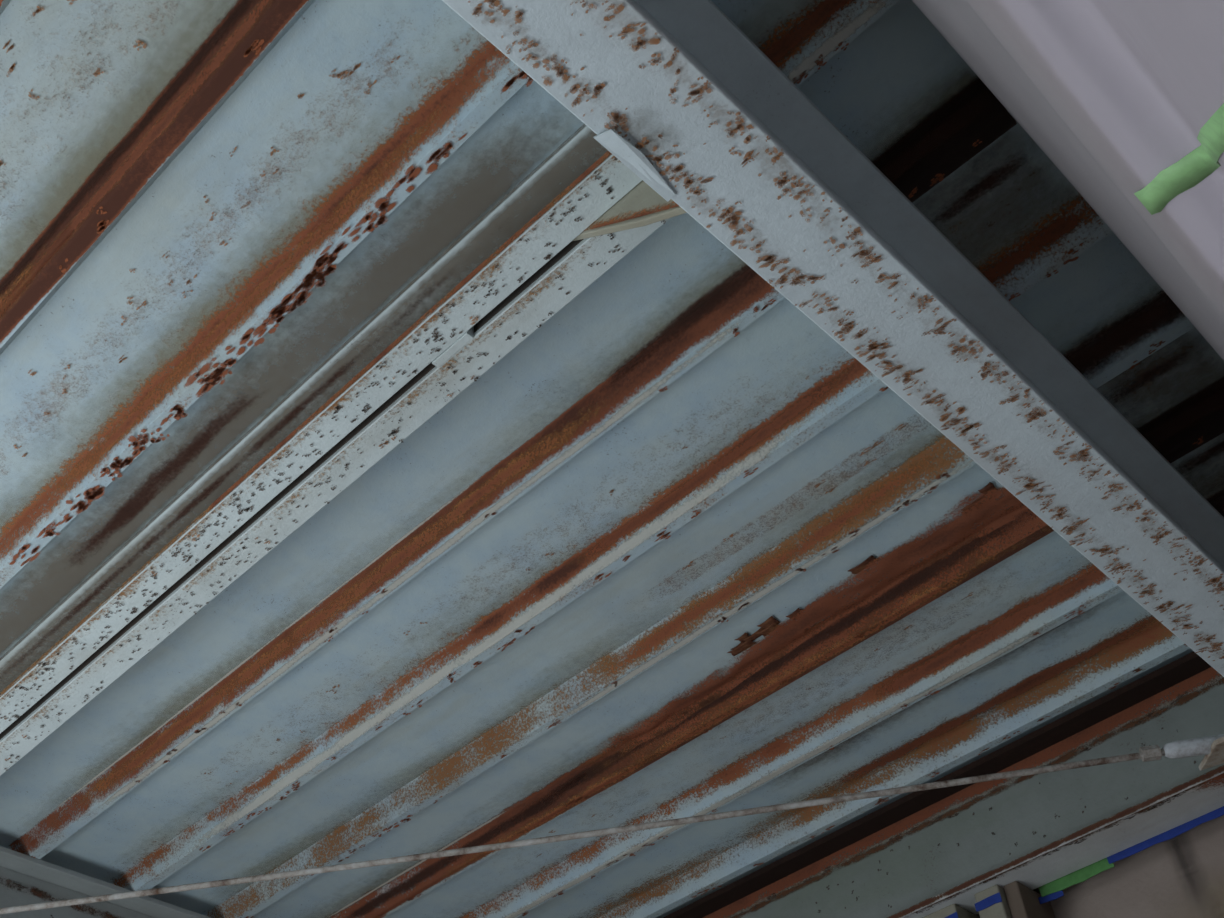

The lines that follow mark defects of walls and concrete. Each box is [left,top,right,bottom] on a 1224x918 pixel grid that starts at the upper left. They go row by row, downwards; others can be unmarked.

rust [0,877,57,918]
rust [71,905,119,918]
rust [0,0,605,660]
rust [0,108,825,858]
rust [113,290,1224,918]
rust [570,0,1224,606]